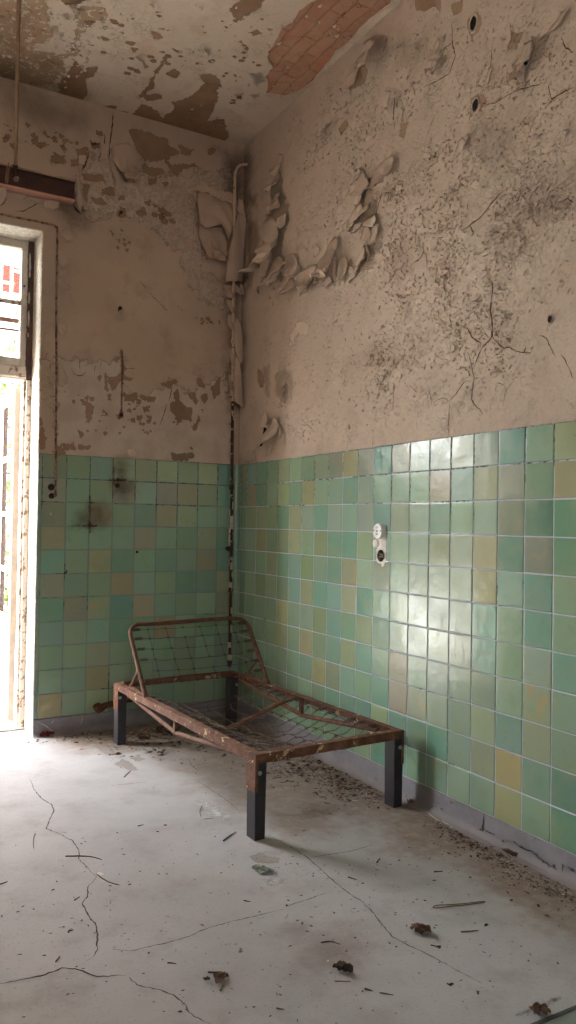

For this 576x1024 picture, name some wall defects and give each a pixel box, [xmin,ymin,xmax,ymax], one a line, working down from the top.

peeling [0,0,242,225]
peeling [39,155,395,464]
spalling [221,0,390,96]
crack [380,282,573,432]
crack [461,188,507,236]
crack [0,780,477,1024]